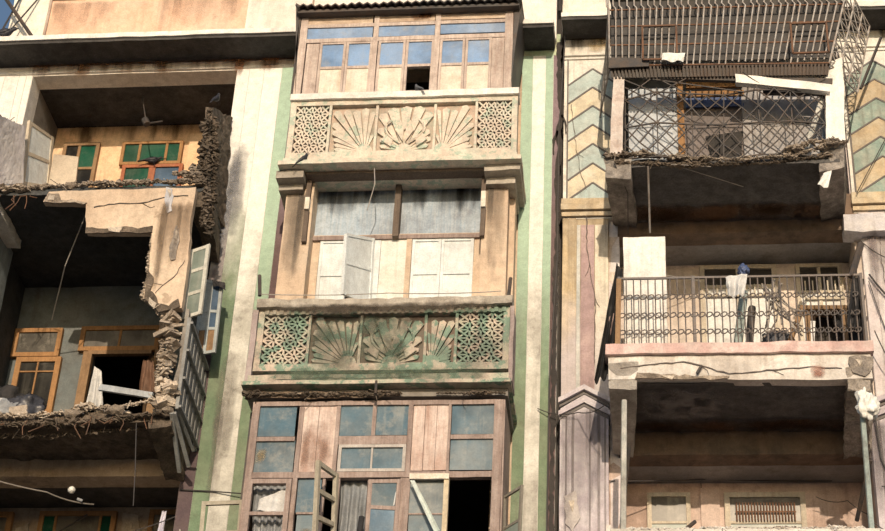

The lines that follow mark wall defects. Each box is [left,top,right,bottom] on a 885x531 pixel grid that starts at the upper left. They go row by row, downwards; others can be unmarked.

spalling [603,136,848,170]
spalling [0,109,220,239]
crack [94,195,188,208]
crack [621,361,842,375]
spalling [0,393,170,441]